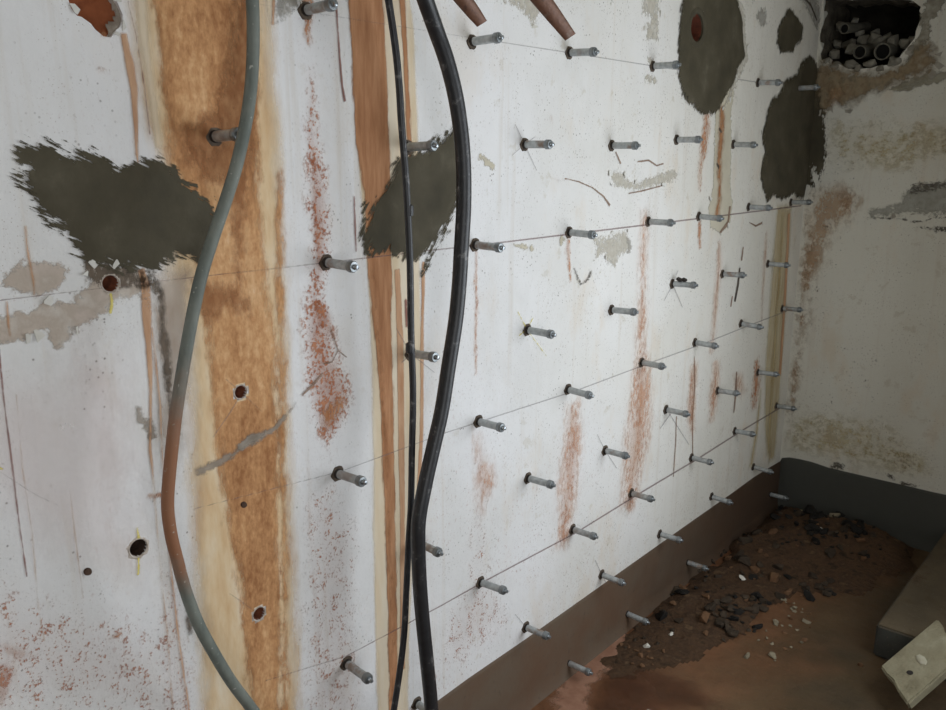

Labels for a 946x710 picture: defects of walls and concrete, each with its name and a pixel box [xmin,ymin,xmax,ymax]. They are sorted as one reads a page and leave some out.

peeling [0,258,160,350]
spalling [69,0,127,37]
corrosion [121,34,150,162]
corrosion [138,269,163,472]
corrosion [303,82,350,442]
corrosion [336,0,425,710]
corrosion [626,367,650,502]
peeling [609,152,677,194]
flaking render [708,0,750,235]
spalling [803,0,946,116]
peeling [869,181,946,232]
corrosion [309,492,356,710]